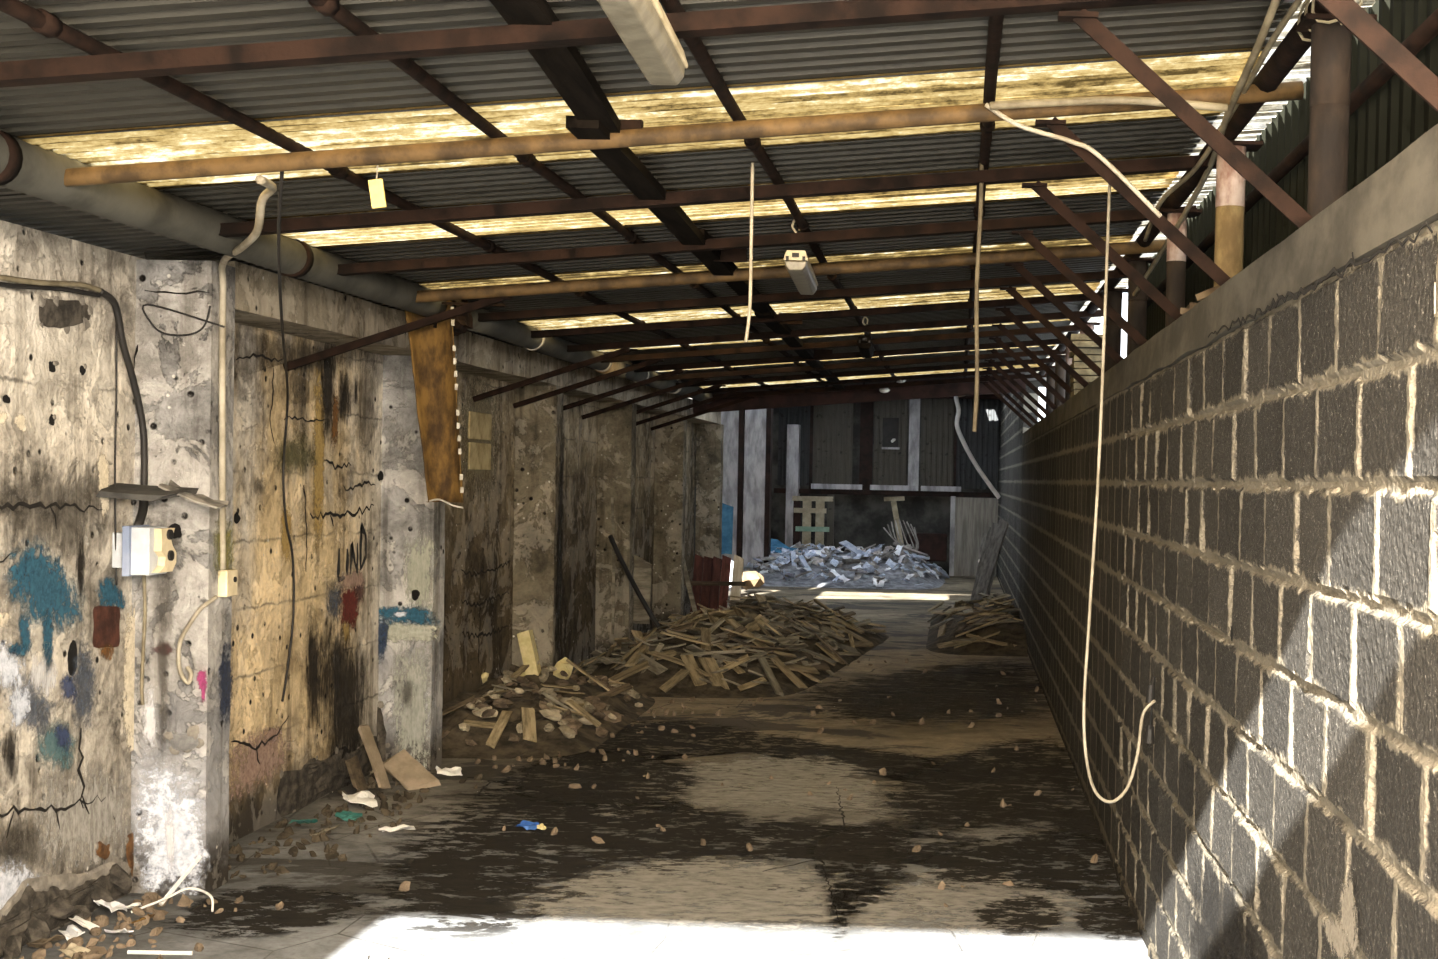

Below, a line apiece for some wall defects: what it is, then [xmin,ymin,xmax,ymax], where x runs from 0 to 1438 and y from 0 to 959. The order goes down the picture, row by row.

crack [0,501,103,529]
water stain [10,454,109,597]
water stain [162,572,170,606]
water stain [2,656,56,781]
water stain [143,650,166,750]
water stain [306,620,368,759]
water stain [393,647,431,767]
water stain [801,659,1051,726]
crack [0,728,106,838]
water stain [0,720,1142,940]